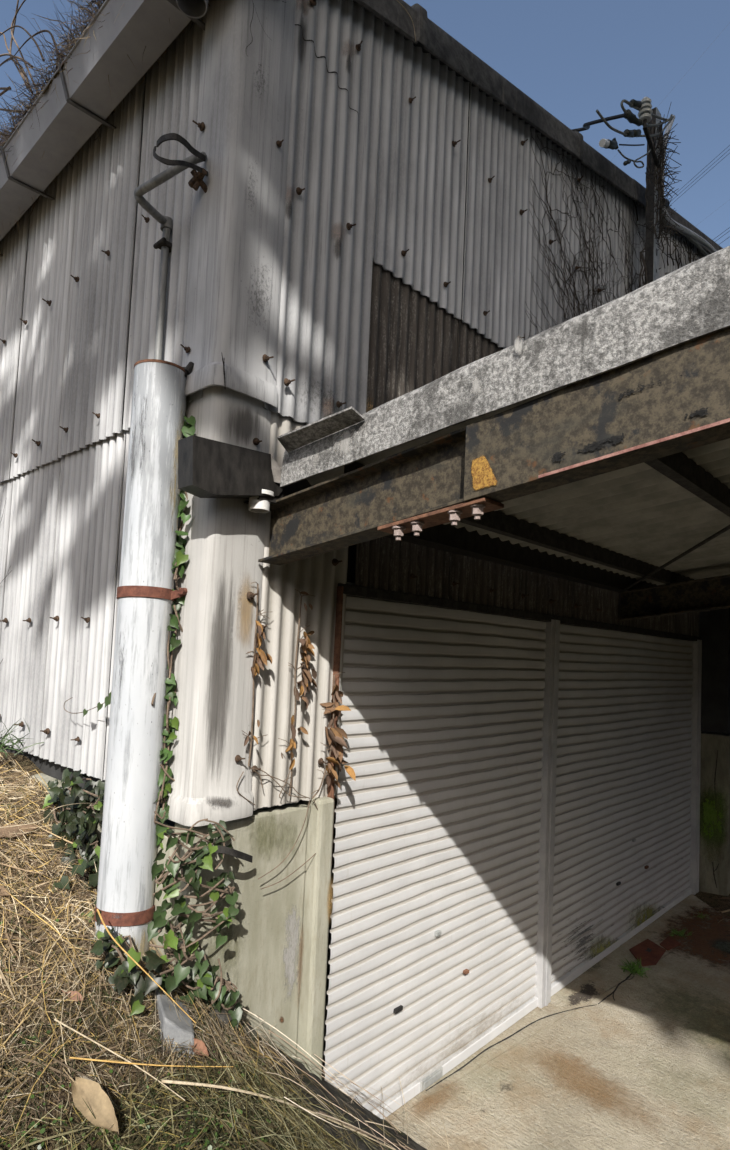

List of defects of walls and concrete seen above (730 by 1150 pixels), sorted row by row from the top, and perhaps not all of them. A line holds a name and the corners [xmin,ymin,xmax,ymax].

corrosion [134,359,185,372]